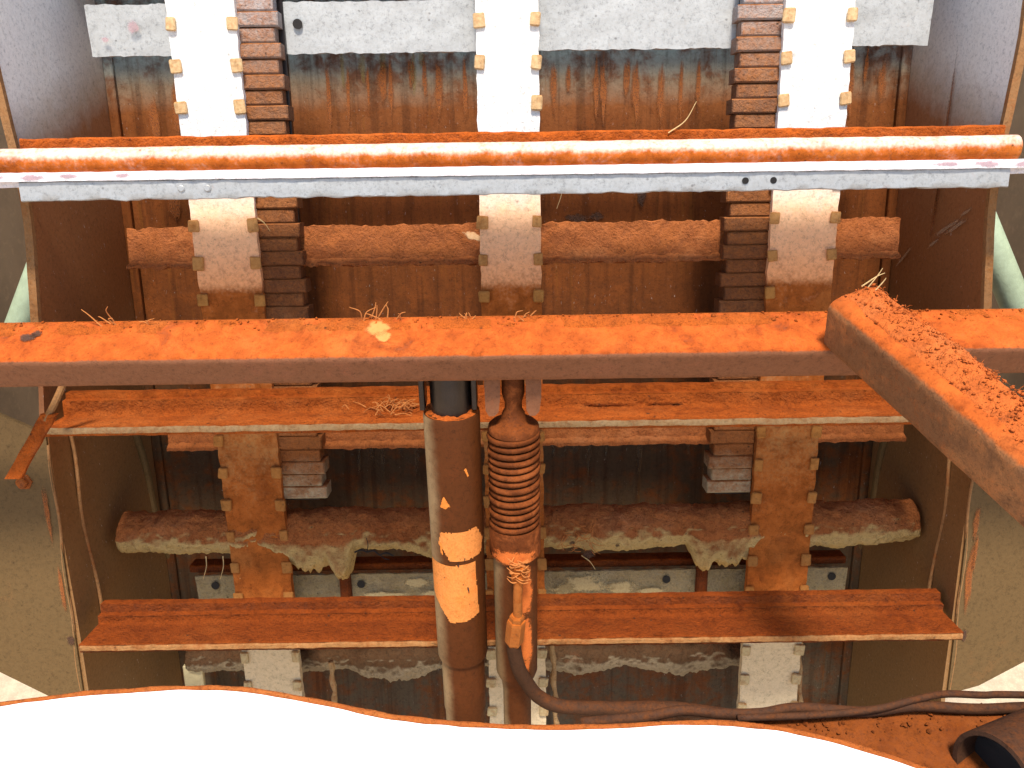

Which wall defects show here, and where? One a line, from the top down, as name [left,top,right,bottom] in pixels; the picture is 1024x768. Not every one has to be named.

corrosion [20,331,41,341]
peeling [368,321,390,342]